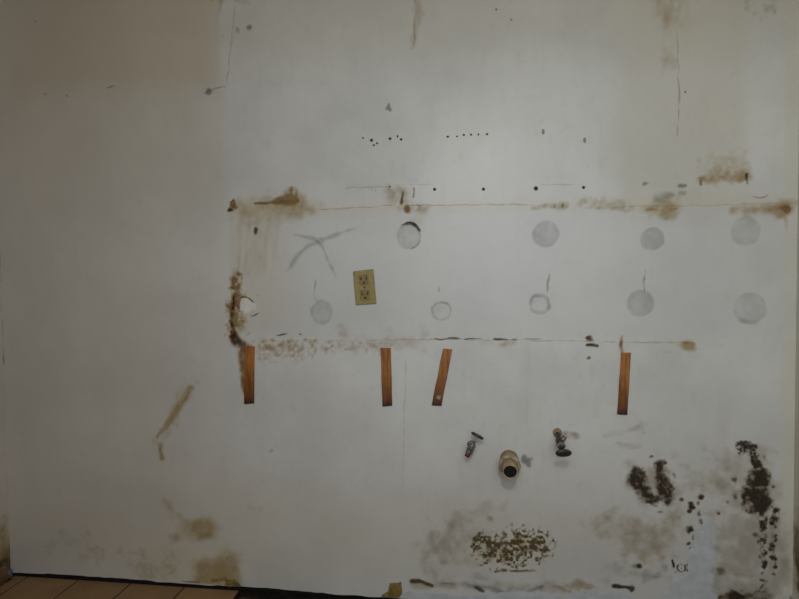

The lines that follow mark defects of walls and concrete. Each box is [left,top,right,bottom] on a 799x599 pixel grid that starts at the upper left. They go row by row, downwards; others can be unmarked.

mould [470,525,554,572]
leakage [627,455,704,545]
mould [732,441,780,575]
leakage [718,590,746,599]